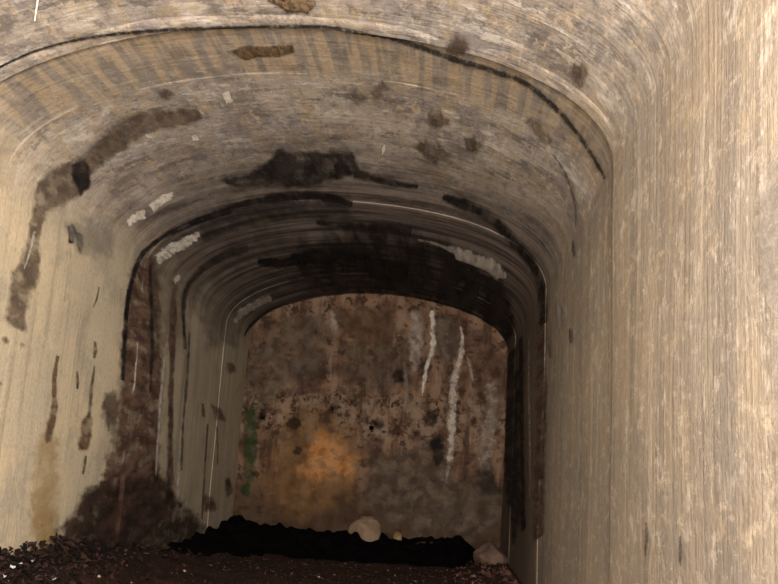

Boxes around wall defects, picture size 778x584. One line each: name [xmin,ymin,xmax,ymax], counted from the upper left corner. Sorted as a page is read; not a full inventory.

spalling [268,0,315,13]
spalling [233,45,294,60]
leakage [222,150,357,187]
leakage [7,108,201,330]
leakage [54,232,216,550]
leakage [202,403,224,462]
leakage [365,311,546,541]